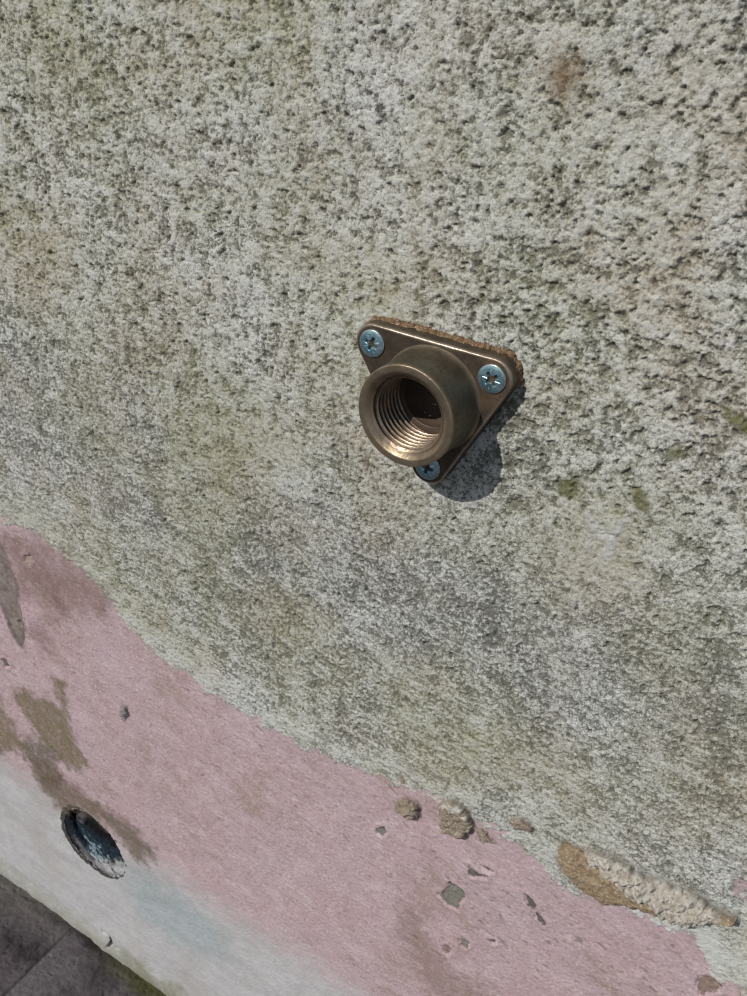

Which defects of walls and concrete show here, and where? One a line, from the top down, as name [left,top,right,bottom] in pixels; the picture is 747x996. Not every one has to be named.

damp [0,681,151,860]
peeling [440,881,465,908]
peeling [698,976,722,995]